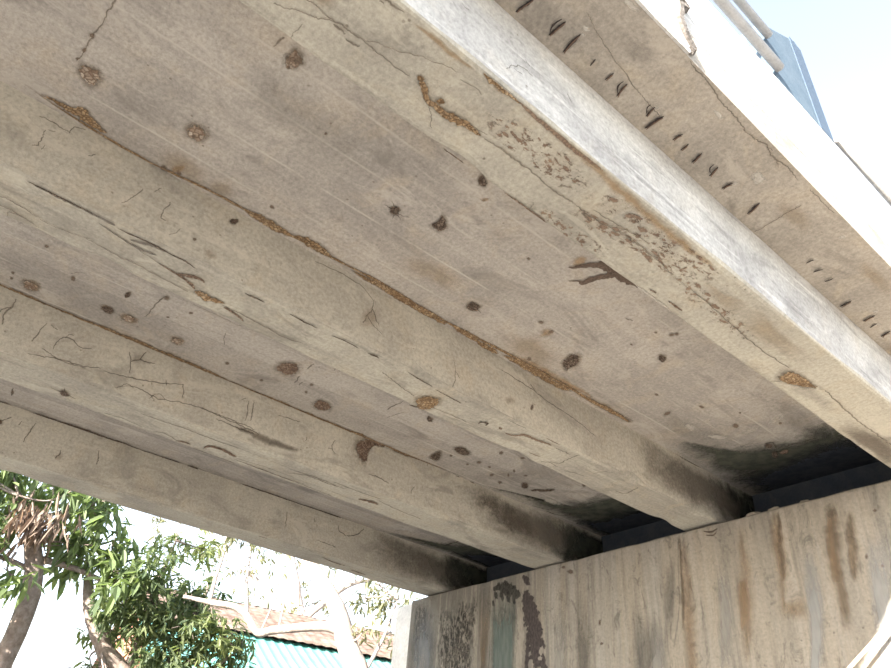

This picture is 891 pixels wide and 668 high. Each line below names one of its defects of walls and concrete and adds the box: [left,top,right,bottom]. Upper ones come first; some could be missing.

spalling [483,73,603,188]
crack [690,61,834,232]
spalling [29,182,193,267]
spalling [505,193,749,339]
crack [468,123,789,382]
crack [28,323,420,519]
spalling [354,432,416,462]
leakage [392,537,511,589]
leakage [484,490,664,560]
leakage [661,427,891,518]
corrosion [827,510,857,618]
leakage [491,604,515,668]